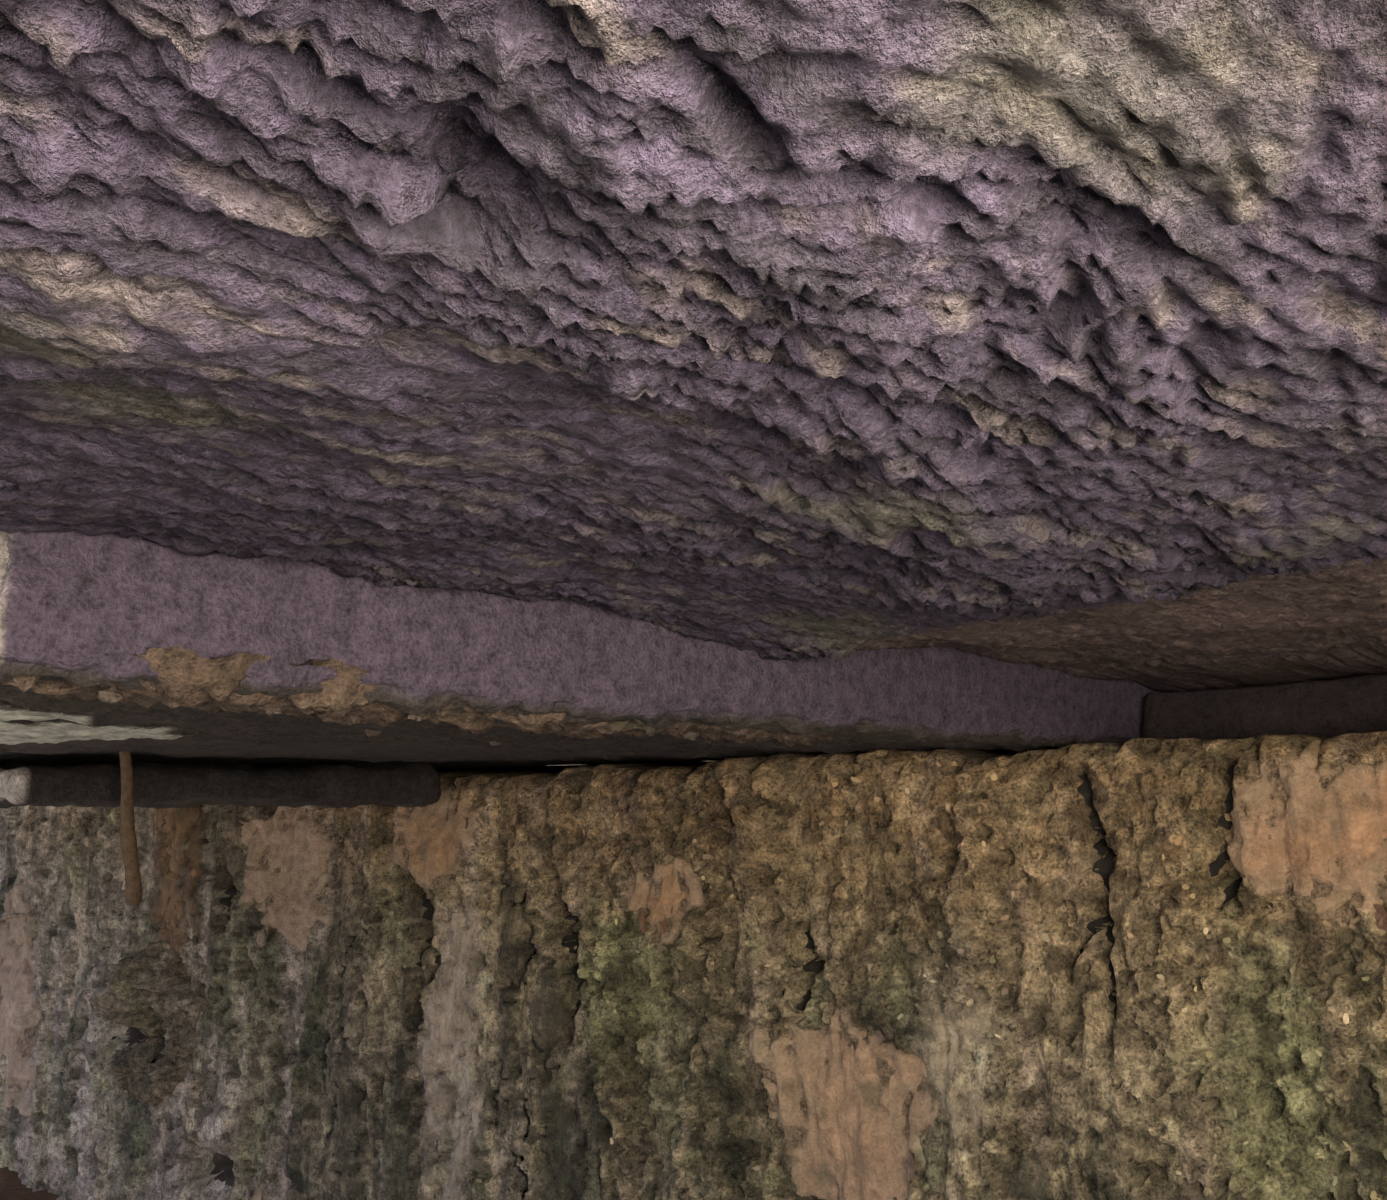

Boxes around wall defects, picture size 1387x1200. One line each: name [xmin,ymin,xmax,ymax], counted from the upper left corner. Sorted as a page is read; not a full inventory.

peeling [1224,741,1387,934]
leakage [421,874,602,1200]
peeling [748,1006,938,1200]
leakage [929,995,992,1130]